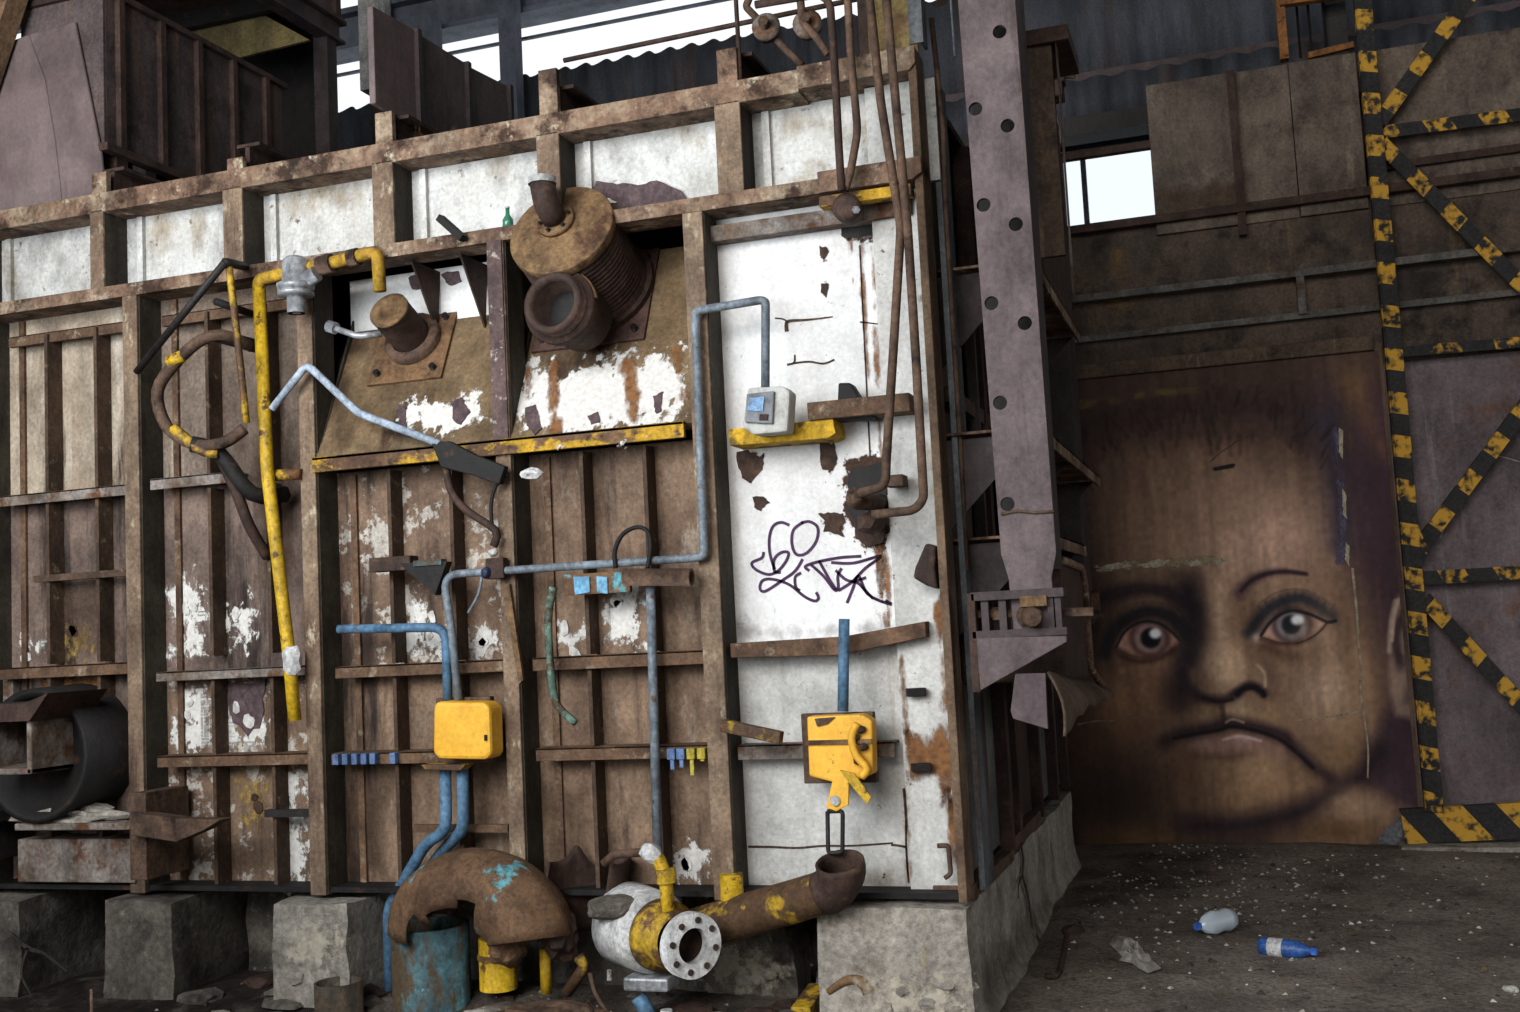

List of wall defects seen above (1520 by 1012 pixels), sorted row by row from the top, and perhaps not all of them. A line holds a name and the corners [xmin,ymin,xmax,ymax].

peeling [396,388,492,438]
peeling [516,341,689,450]
peeling [165,572,261,666]
peeling [405,600,447,660]
rust [876,552,891,628]
rust [933,595,942,638]
peeling [170,679,270,830]
rust [899,656,956,858]
peeling [287,770,310,896]